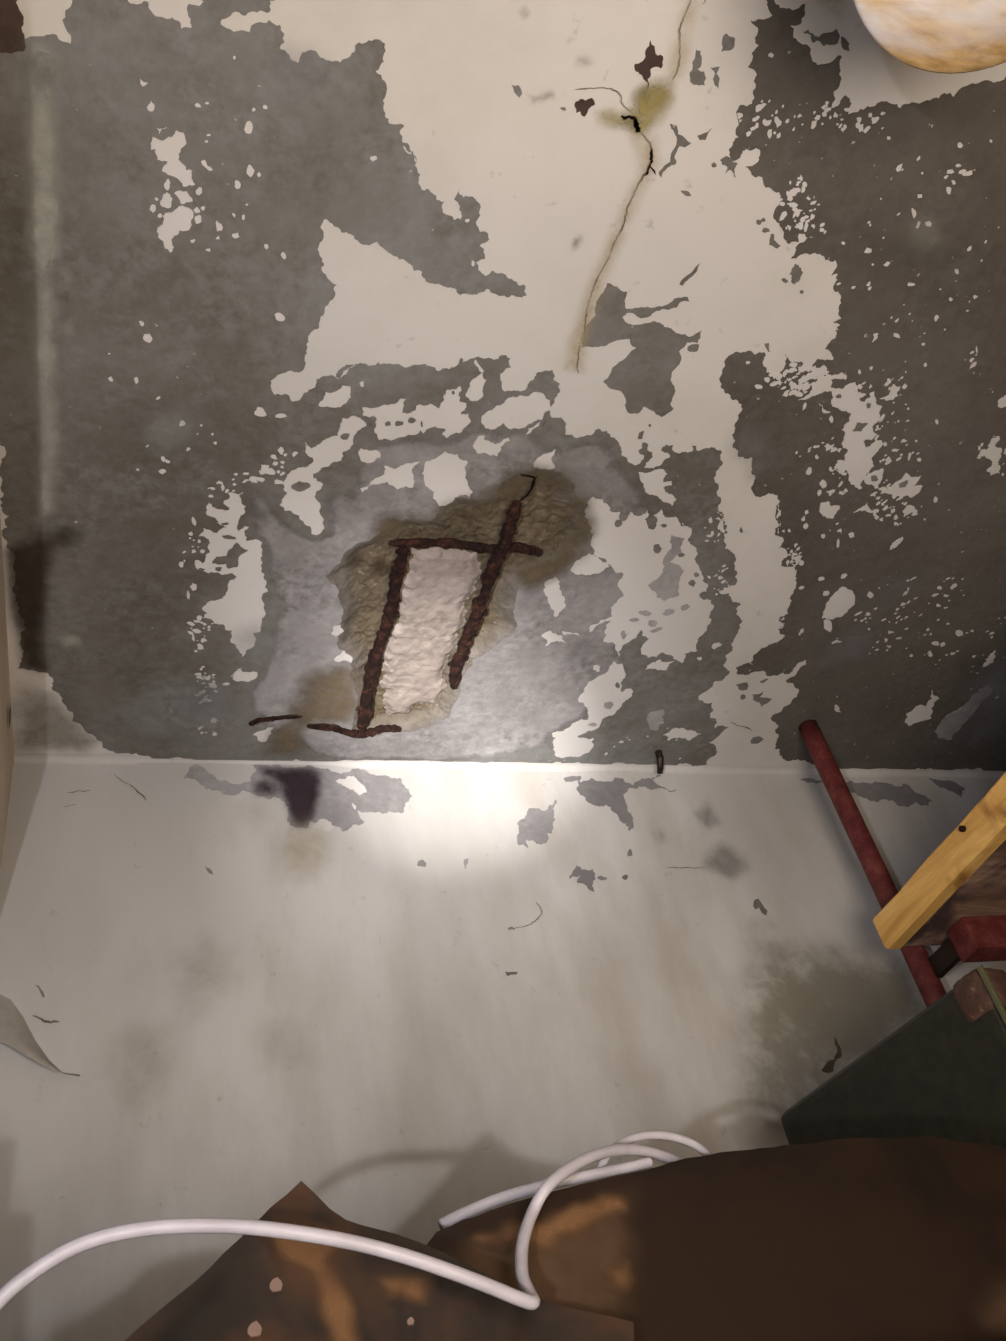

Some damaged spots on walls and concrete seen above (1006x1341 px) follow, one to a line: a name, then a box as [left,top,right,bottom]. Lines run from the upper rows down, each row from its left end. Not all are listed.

crack [672,0,691,81]
crack [576,87,656,373]
peeling [0,0,1006,832]
peeling [517,800,557,848]
peeling [569,865,628,892]